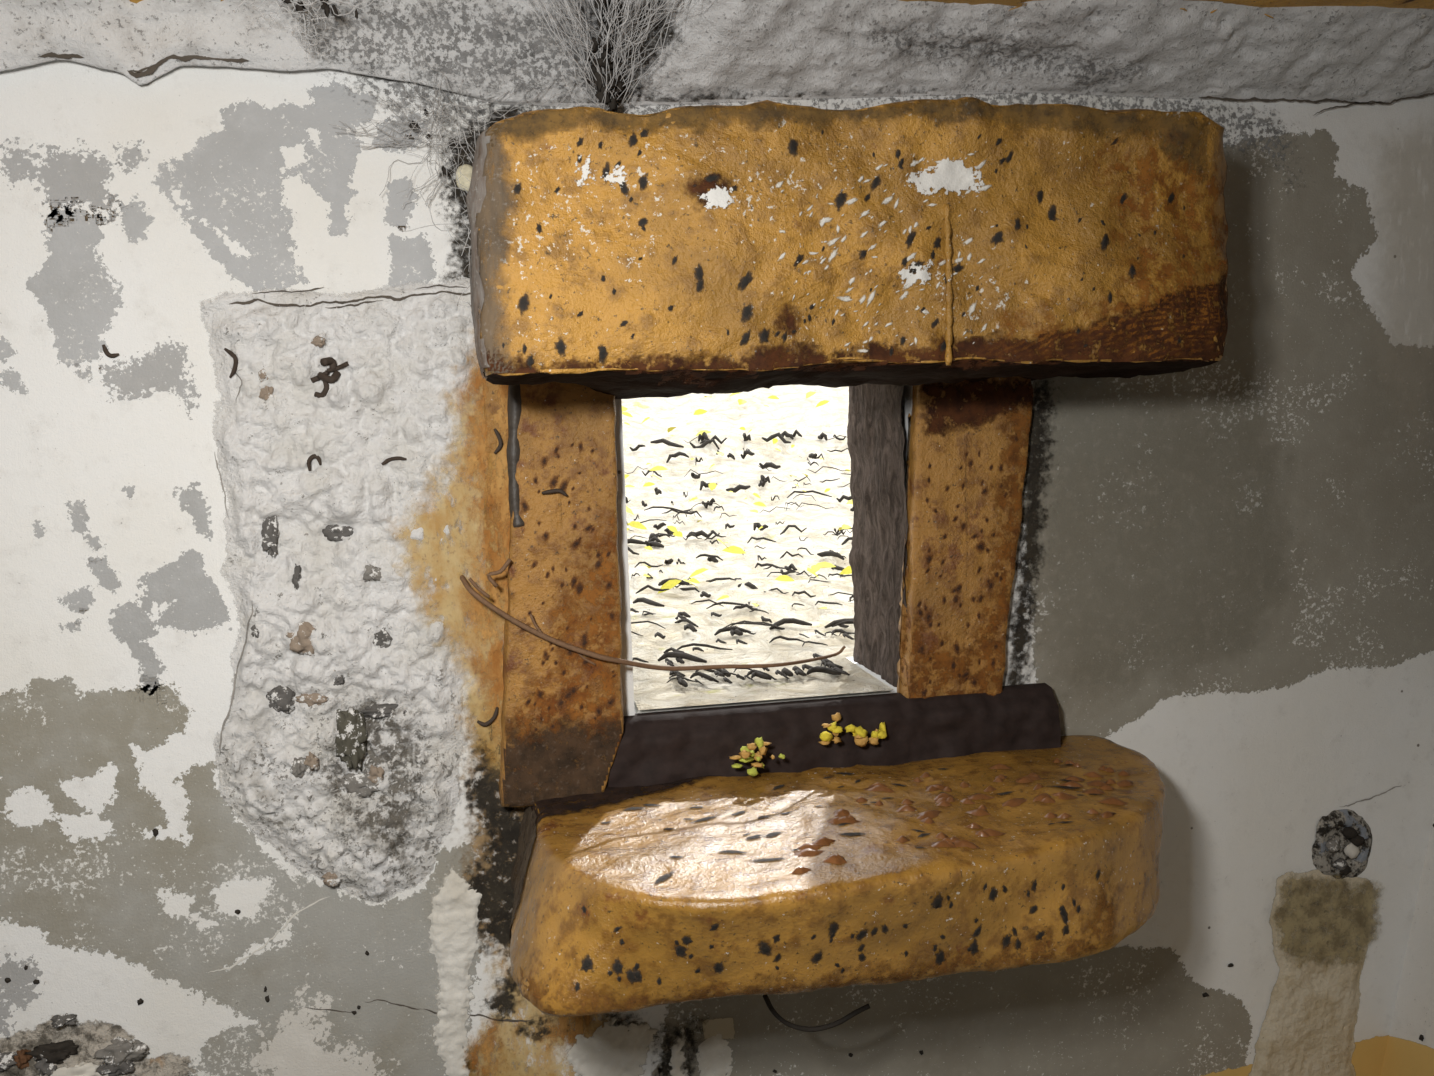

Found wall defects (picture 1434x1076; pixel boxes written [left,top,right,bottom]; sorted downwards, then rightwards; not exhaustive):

peeling [900,0,1027,10]
peeling [601,164,627,191]
peeling [778,157,939,353]
peeling [896,237,987,344]
peeling [1022,128,1434,738]
spalling [0,80,480,1076]
corrosion [398,98,1228,1076]
leakage [464,724,551,1040]
spalling [1312,809,1372,879]
peeling [462,920,536,1076]
leakage [653,1020,704,1076]
peeling [651,944,1253,1076]